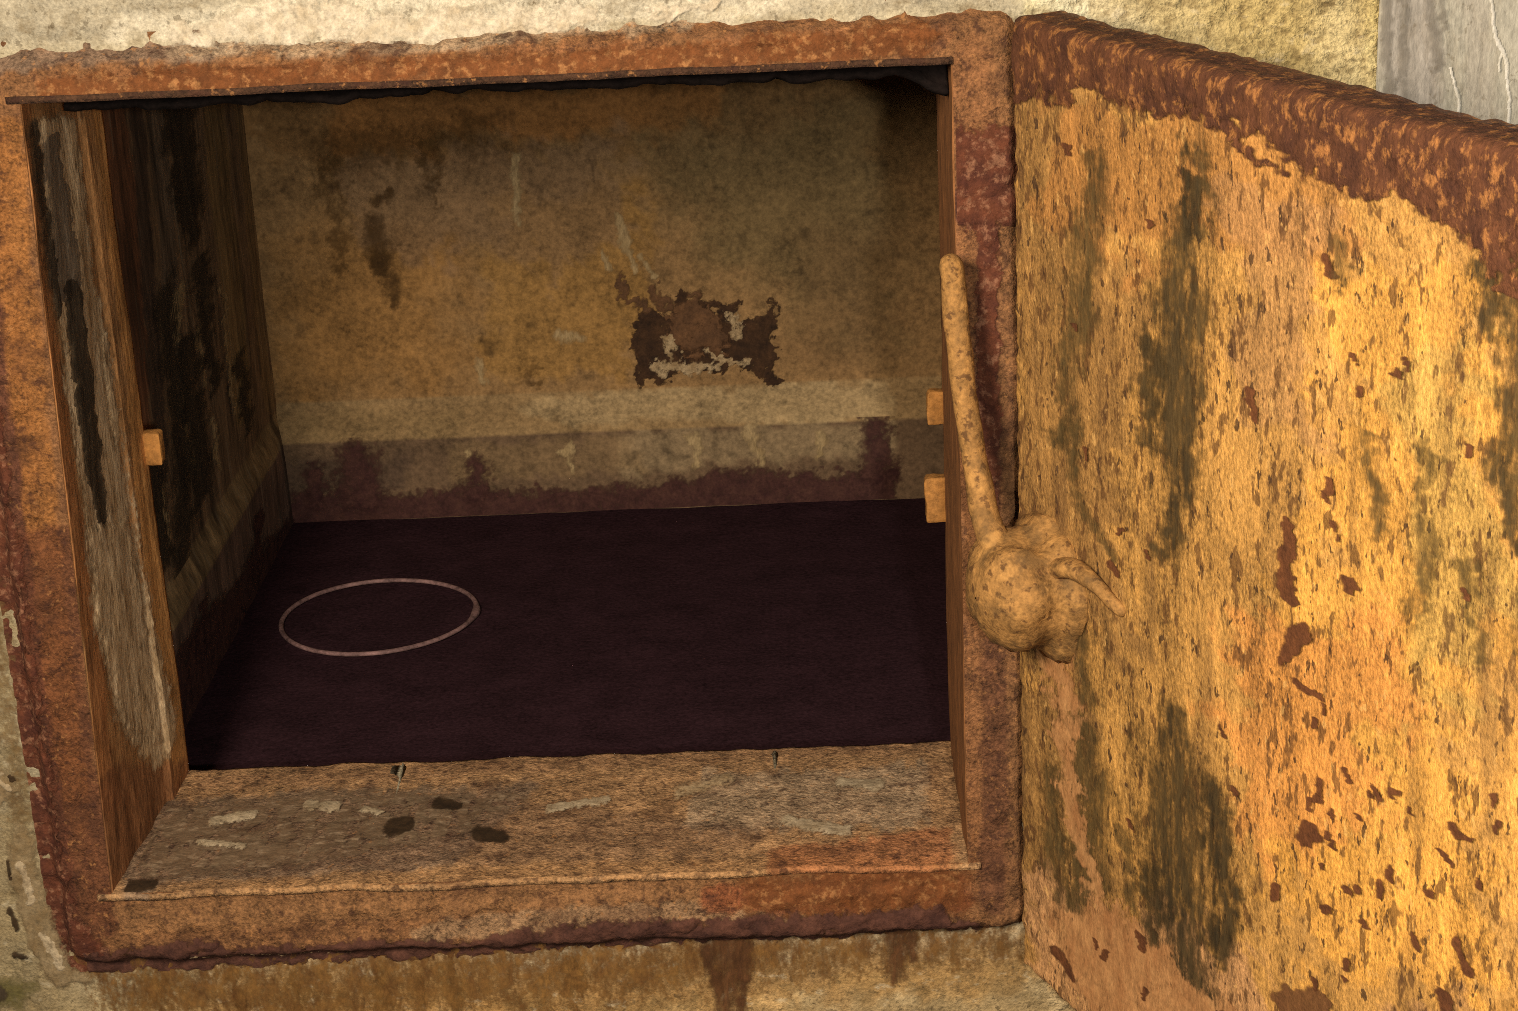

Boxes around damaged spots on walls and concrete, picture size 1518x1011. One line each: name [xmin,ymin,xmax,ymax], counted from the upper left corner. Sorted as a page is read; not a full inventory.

rust [38,19,941,96]
rust [1011,10,1518,300]
damp [149,108,255,577]
damp [365,188,399,308]
peeling [614,271,785,389]
rust [956,120,1018,509]
rust [74,869,1022,1011]